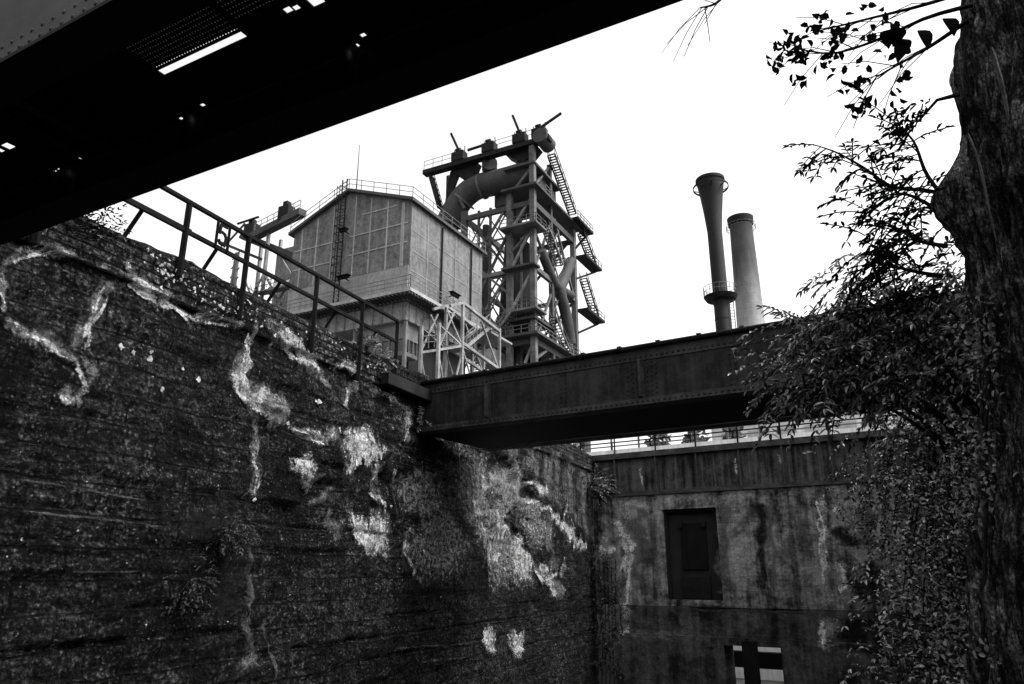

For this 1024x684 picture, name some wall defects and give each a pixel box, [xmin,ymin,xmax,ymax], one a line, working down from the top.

leakage [0,242,114,408]
leakage [126,261,411,441]
leakage [249,426,260,494]
leakage [714,498,899,660]